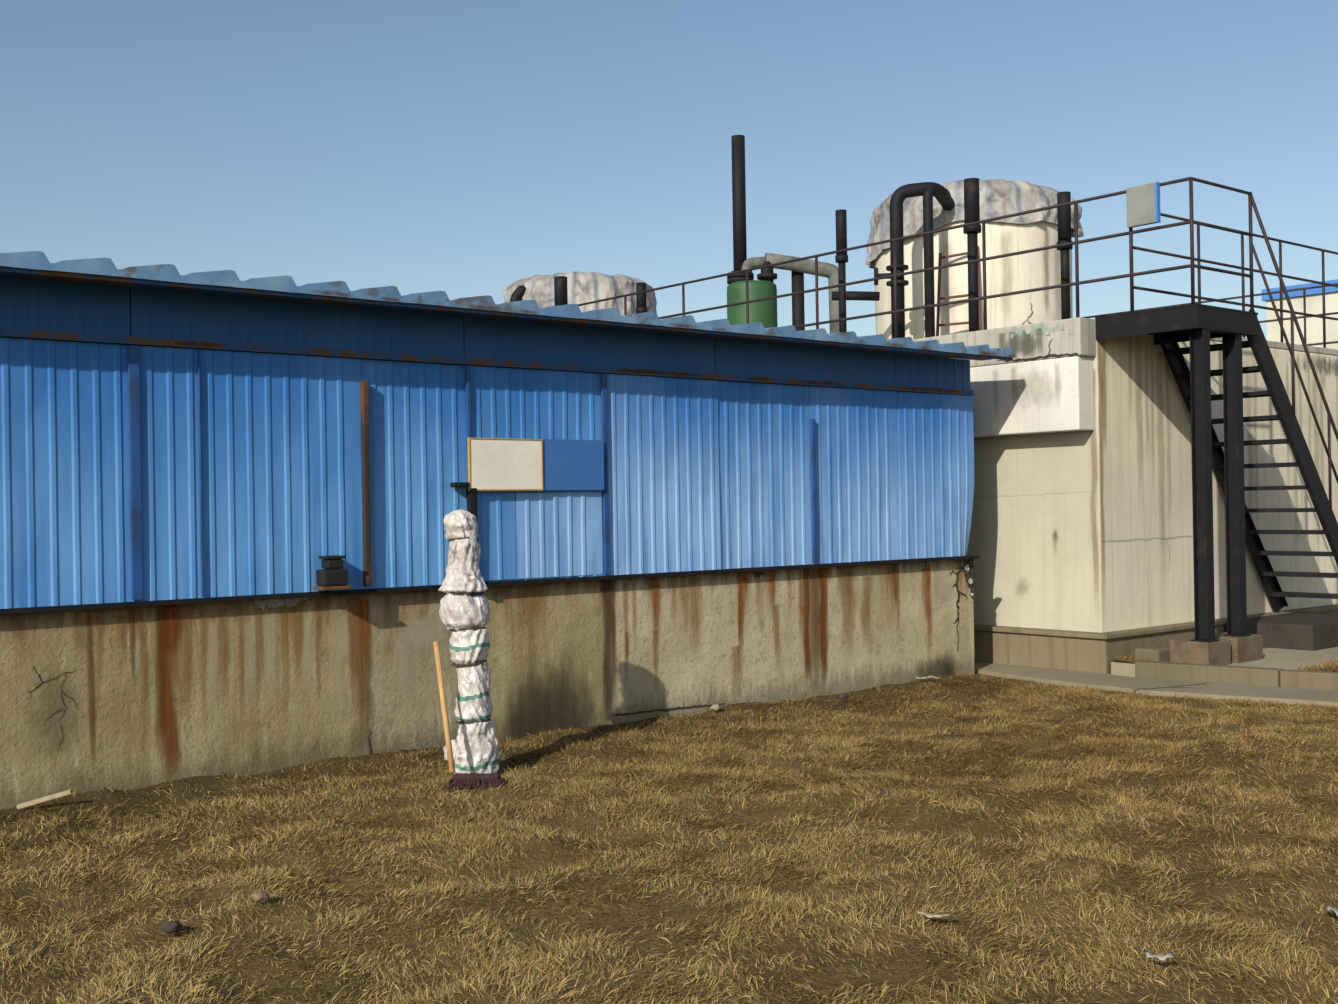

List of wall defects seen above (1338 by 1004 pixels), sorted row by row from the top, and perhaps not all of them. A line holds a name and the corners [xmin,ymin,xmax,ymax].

crack [27,666,78,748]
rust [157,605,179,765]
rust [359,597,369,710]
rust [739,572,747,631]
rust [803,568,827,674]
crack [950,567,967,651]